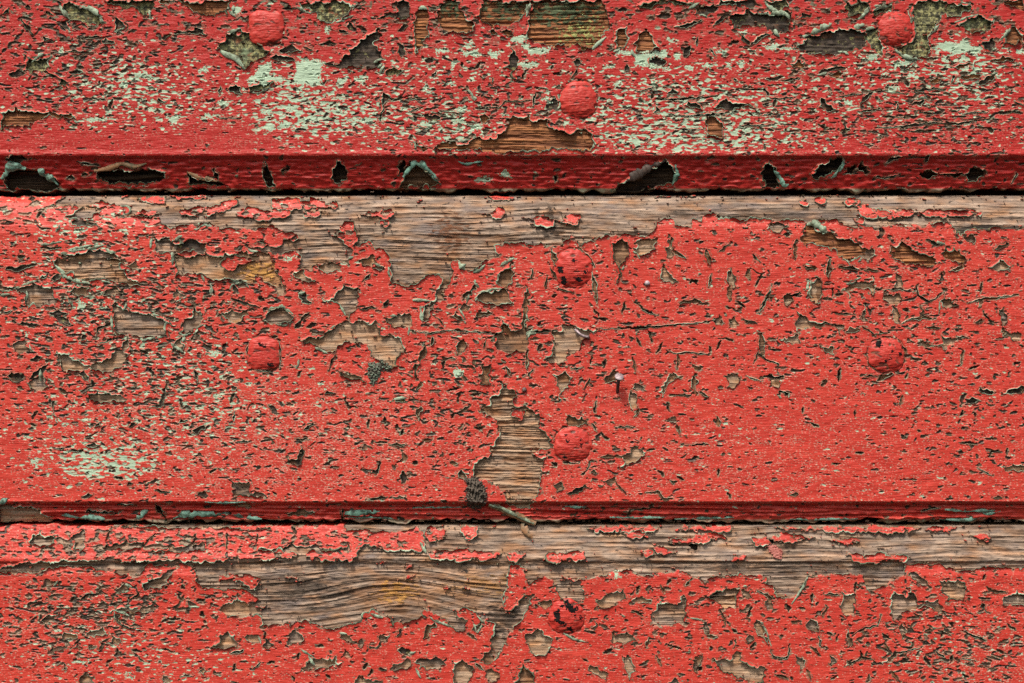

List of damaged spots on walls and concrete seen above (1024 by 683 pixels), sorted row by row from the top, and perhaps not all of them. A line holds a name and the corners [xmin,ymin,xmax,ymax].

peeling [23,47,70,89]
peeling [59,0,1024,119]
peeling [0,89,1024,405]
crack [530,233,1017,512]
peeling [0,365,1024,683]
crack [170,585,205,620]
crack [230,632,324,682]
crack [363,663,387,675]
crack [632,574,1015,682]